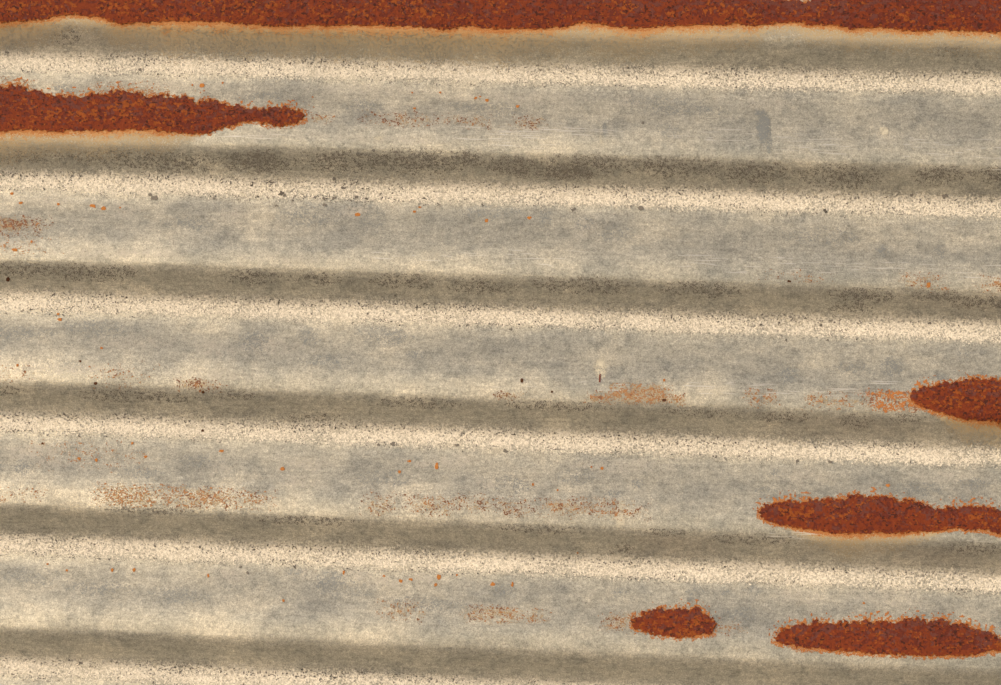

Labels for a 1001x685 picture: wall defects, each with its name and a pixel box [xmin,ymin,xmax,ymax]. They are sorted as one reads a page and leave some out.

rust [0,0,1001,37]
rust [0,76,335,137]
rust [802,370,1001,429]
rust [753,484,1001,540]
rust [598,599,748,642]
rust [769,602,1001,660]